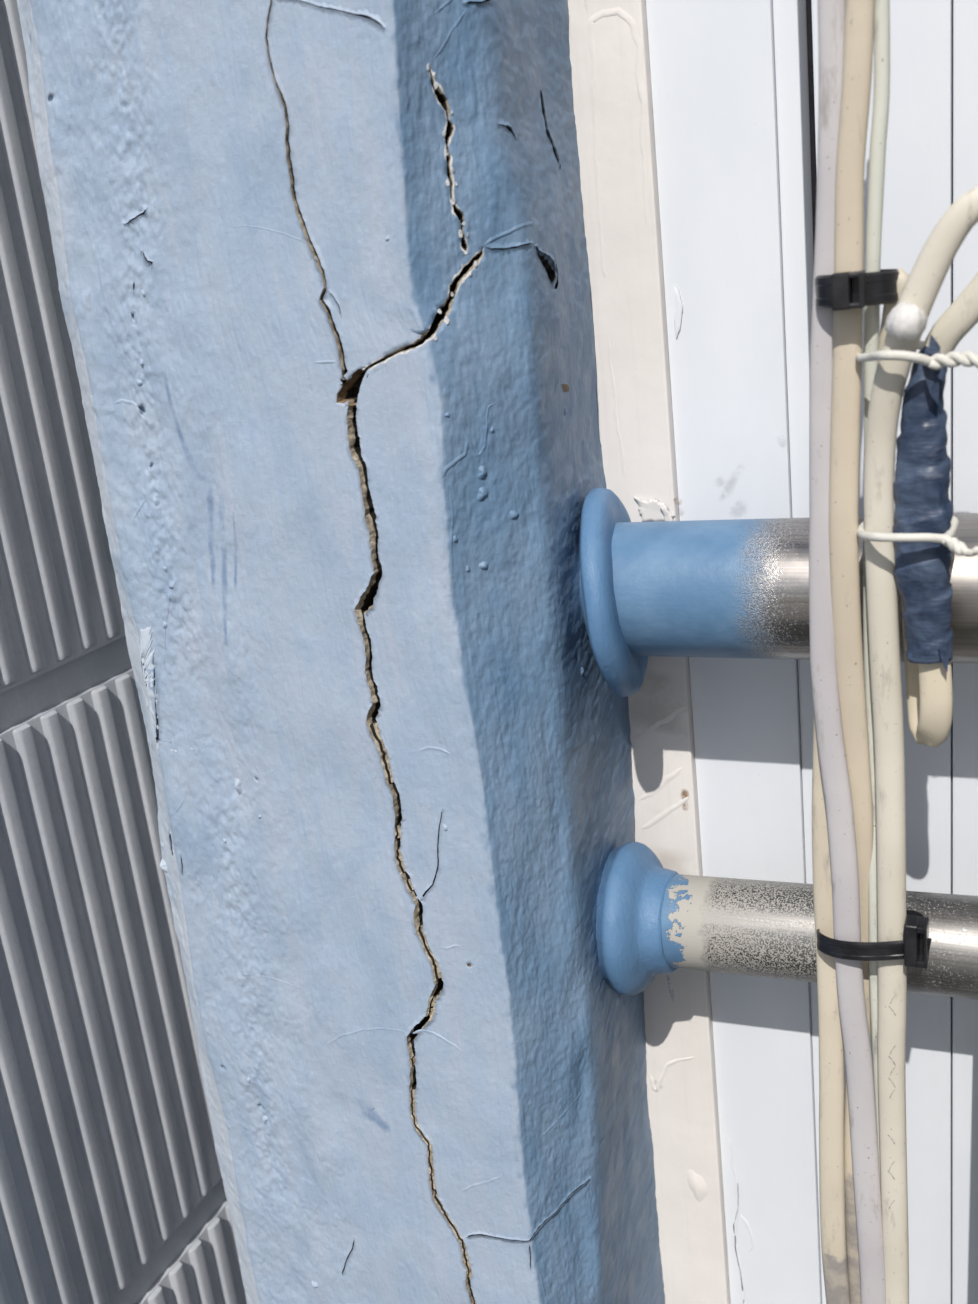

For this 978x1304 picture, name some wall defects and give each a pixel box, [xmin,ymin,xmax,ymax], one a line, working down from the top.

crack [232,0,591,1304]